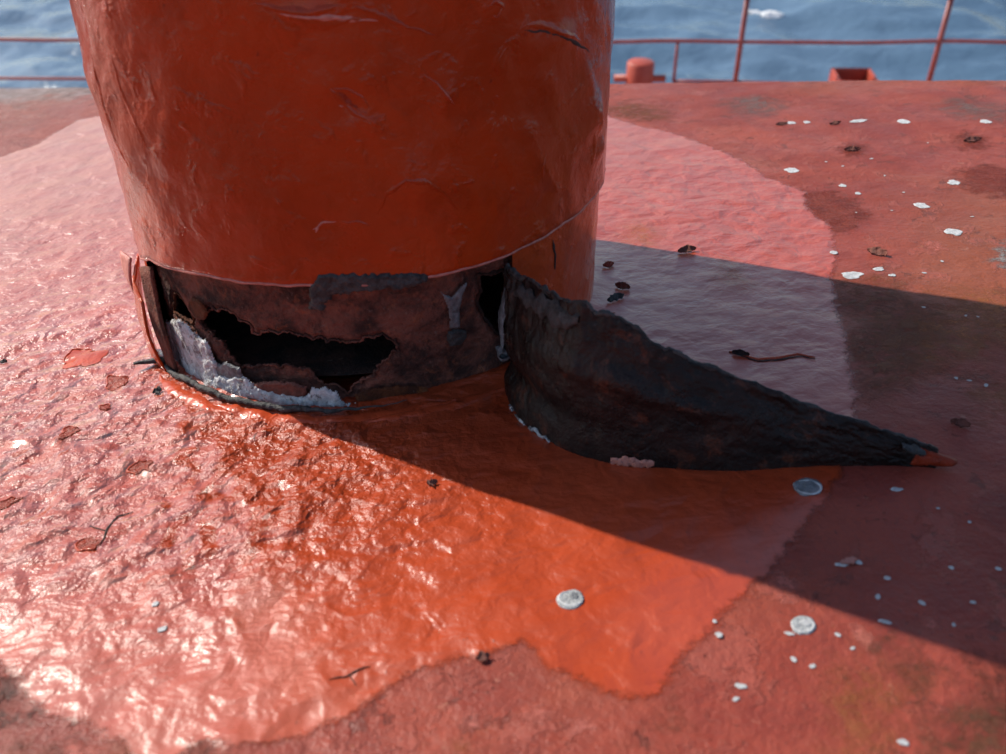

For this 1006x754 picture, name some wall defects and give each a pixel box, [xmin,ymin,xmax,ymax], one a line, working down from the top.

corrosion [188,297,209,320]
peeling [513,283,579,330]
peeling [607,282,630,302]
corrosion [133,357,429,414]
peeling [509,404,550,442]
peeling [610,456,654,468]